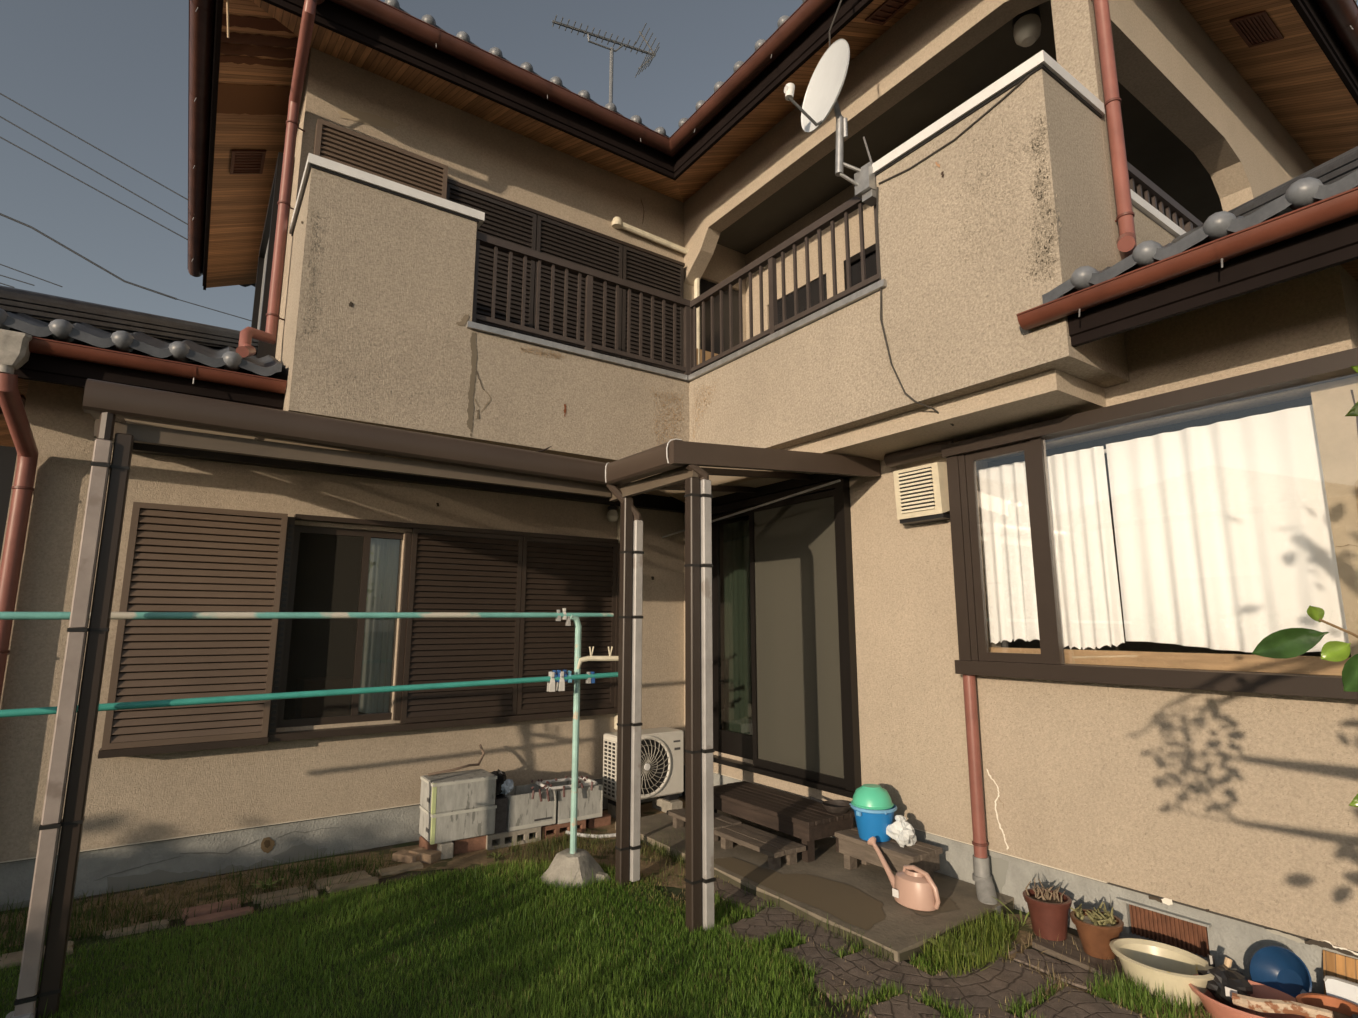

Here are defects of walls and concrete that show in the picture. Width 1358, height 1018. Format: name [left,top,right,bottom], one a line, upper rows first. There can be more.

crack [987,769,1009,849]
water stain [714,857,959,930]